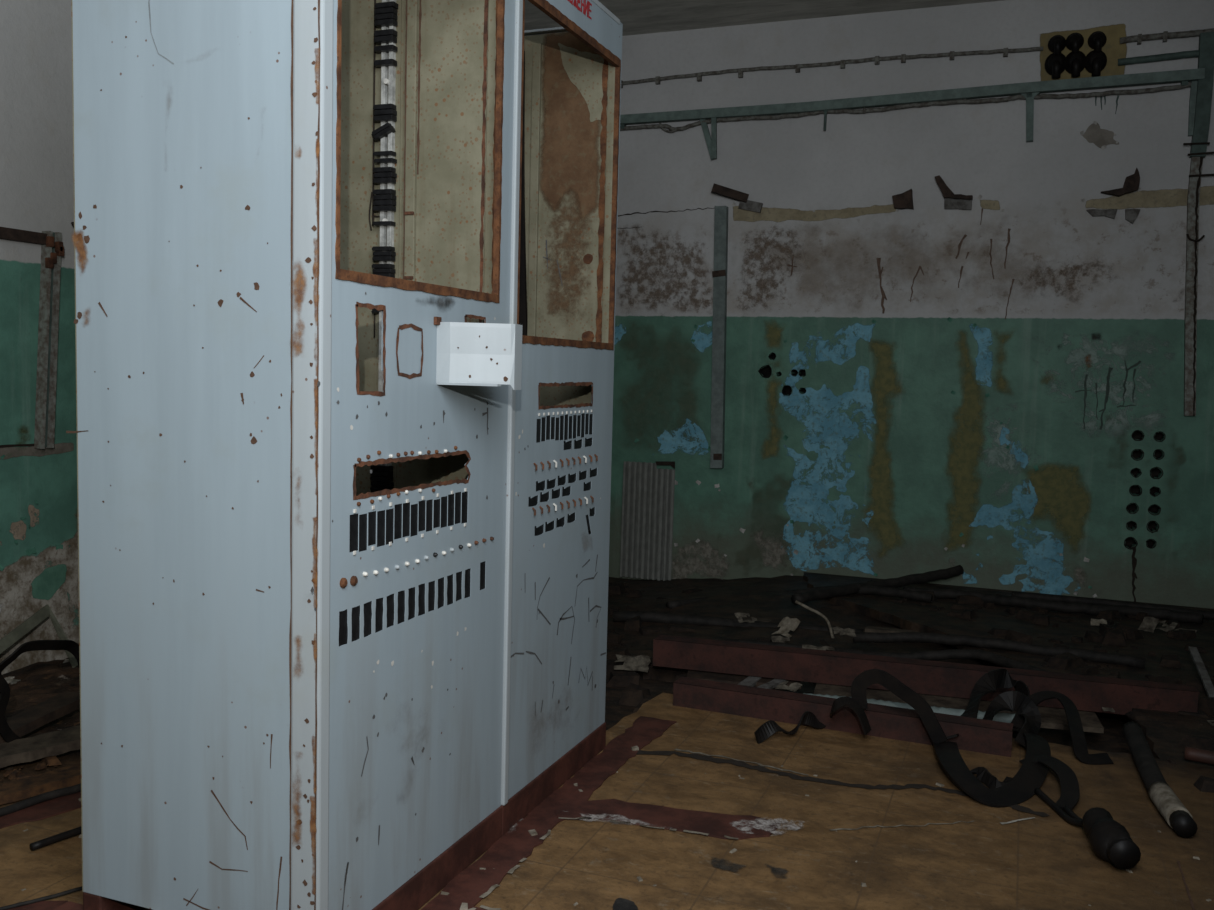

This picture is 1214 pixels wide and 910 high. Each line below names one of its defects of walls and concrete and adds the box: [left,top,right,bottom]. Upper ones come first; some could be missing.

water stain [619,228,710,309]
water stain [743,232,818,303]
flaking render [0,443,74,460]
peeling [652,419,711,455]
peeling [740,319,901,576]
peeling [944,323,1097,598]
flaking render [0,531,79,675]